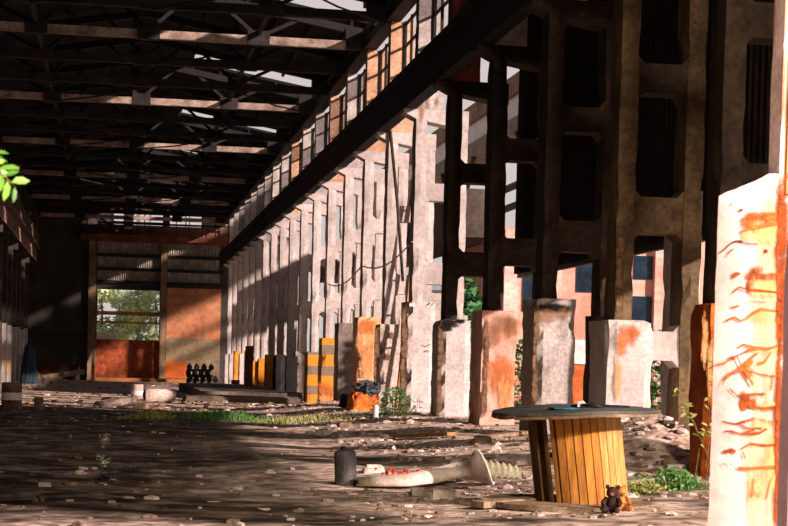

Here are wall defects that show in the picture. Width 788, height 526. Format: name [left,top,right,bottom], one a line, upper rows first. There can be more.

corrosion [614,326,639,399]
corrosion [701,173,788,525]